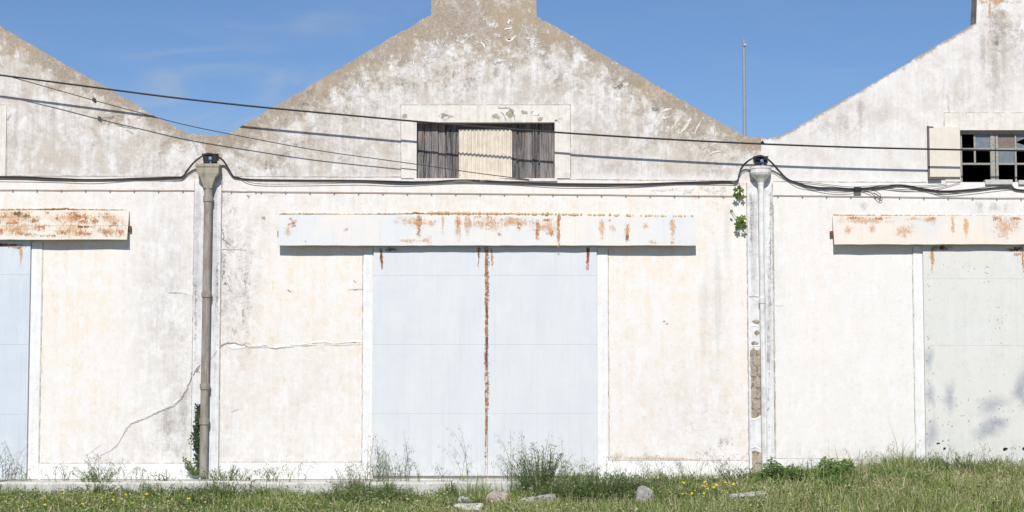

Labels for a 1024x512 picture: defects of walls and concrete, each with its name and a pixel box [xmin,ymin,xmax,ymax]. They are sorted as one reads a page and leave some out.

peeling [460,18,569,73]
corrosion [0,209,124,259]
corrosion [380,215,561,269]
corrosion [839,215,936,236]
corrosion [993,217,1024,273]
corrosion [477,247,494,468]
spalling [749,319,761,420]
crack [90,341,360,456]
spalling [751,446,762,475]